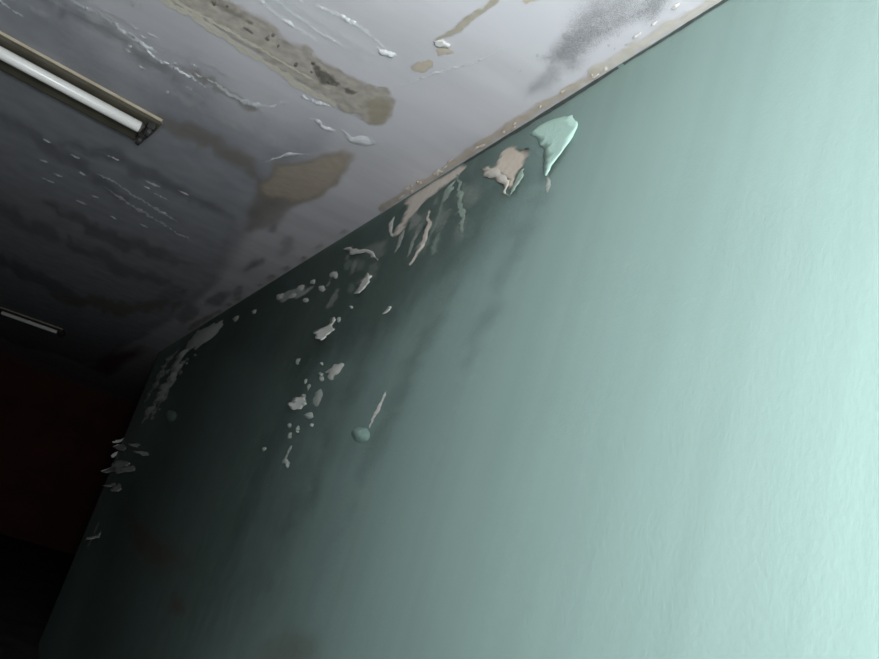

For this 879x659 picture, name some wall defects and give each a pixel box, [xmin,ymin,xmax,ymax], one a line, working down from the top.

flaking render [159,0,397,126]
damp [525,0,670,97]
flaking render [276,0,719,340]
peeling [280,362,344,468]